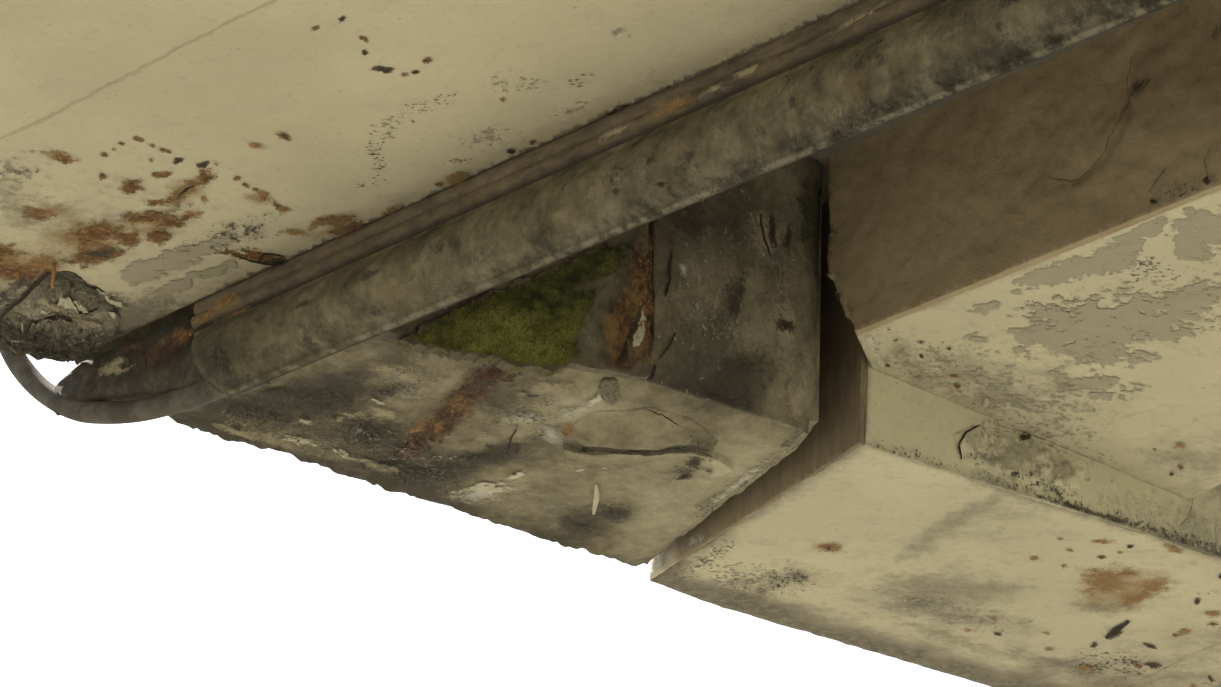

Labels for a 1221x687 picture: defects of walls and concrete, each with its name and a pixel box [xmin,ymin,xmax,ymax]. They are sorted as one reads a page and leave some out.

water stain [356,93,456,188]
crack [1049,58,1151,188]
corrosion [0,137,218,287]
corrosion [234,176,291,212]
corrosion [280,215,362,238]
spalling [0,268,123,363]
peeling [964,176,1221,402]
water stain [215,362,603,487]
corrosion [389,364,522,458]
water stain [982,471,1220,553]
corrosion [1081,539,1169,606]